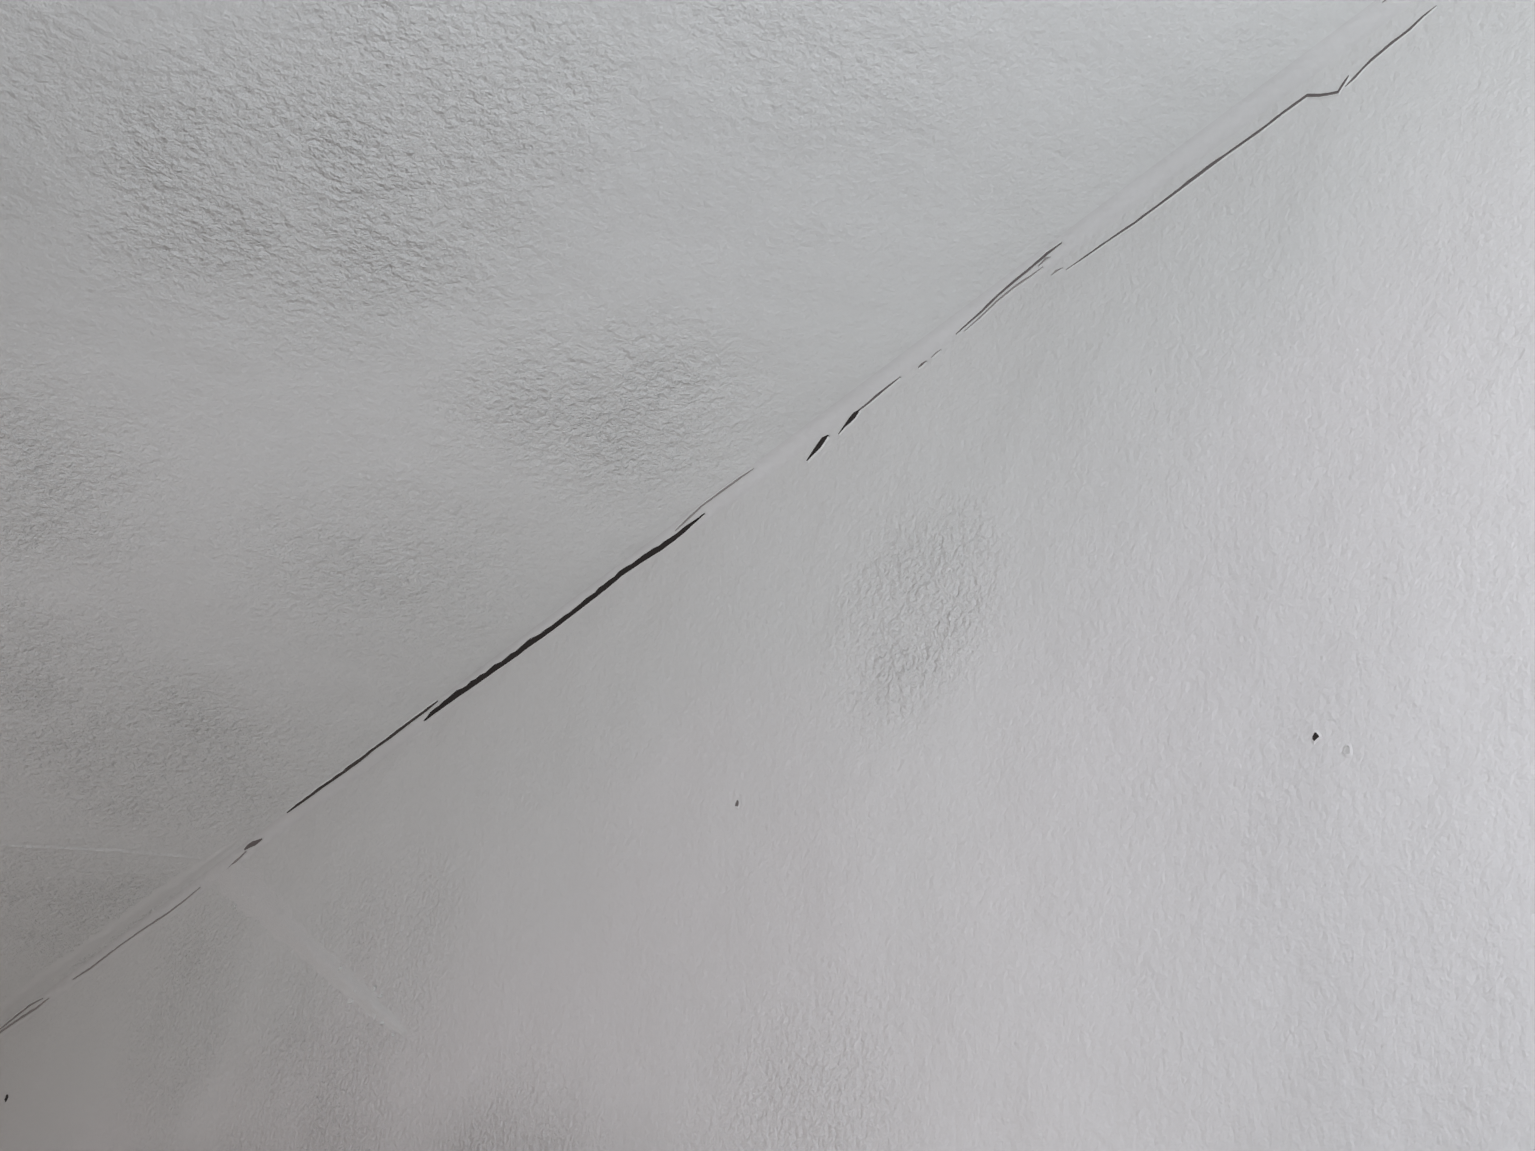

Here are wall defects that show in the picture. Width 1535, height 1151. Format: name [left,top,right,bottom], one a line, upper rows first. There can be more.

crack [956,0,1437,335]
crack [286,468,754,813]
crack [0,838,262,1034]